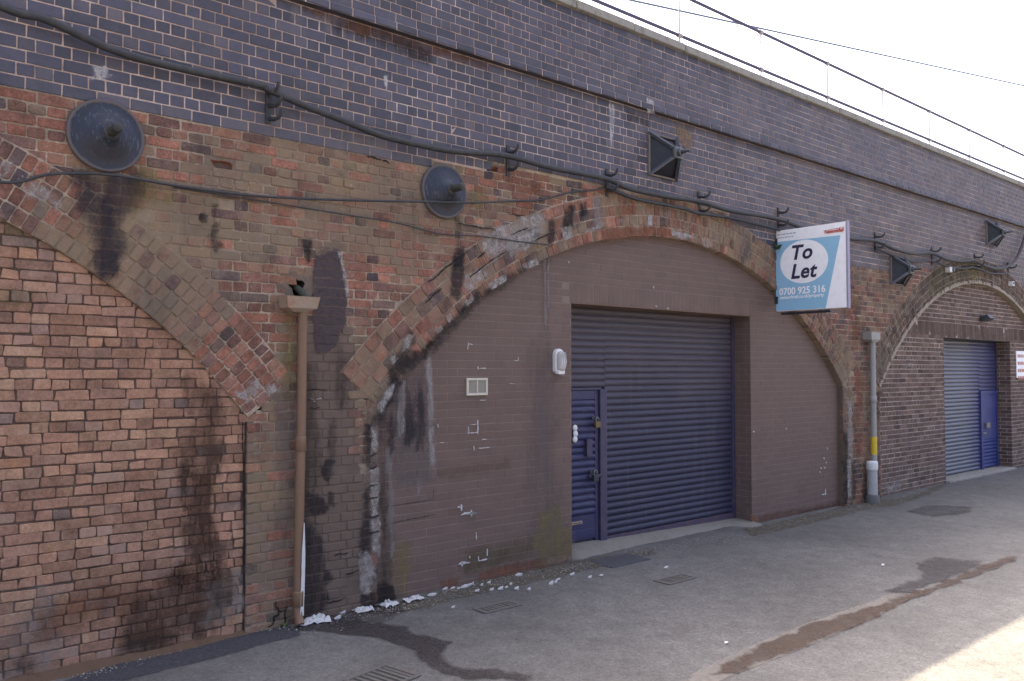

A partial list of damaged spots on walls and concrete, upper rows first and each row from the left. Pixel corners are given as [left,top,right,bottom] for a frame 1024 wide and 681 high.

leakage [73,170,138,277]
leakage [451,217,482,300]
leakage [483,214,555,255]
leakage [296,356,530,681]
leakage [126,563,221,654]